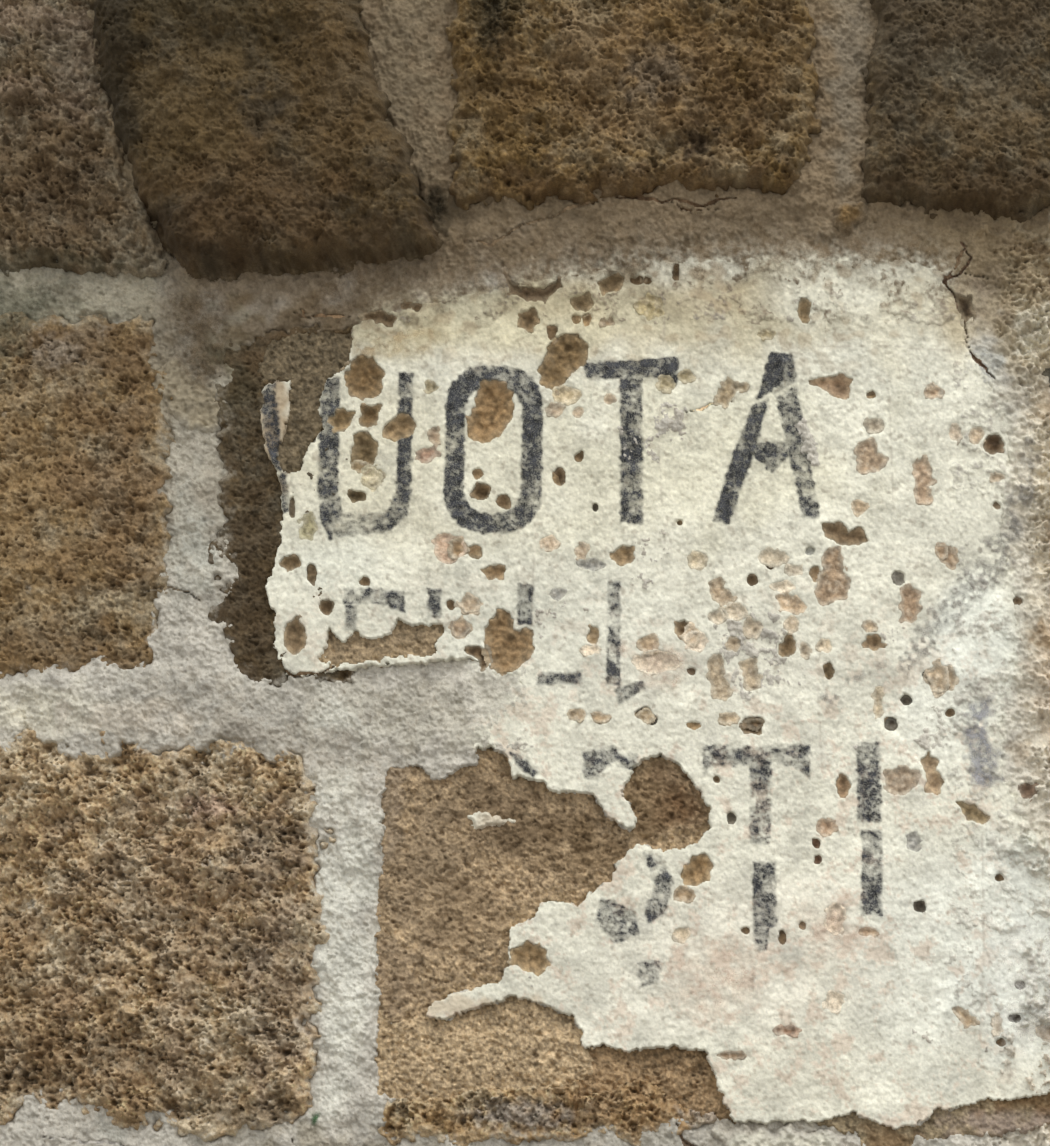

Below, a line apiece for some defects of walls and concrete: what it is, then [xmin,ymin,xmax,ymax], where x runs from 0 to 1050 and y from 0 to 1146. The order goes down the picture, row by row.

spalling [358,310,397,327]
crack [942,242,995,379]
spalling [257,330,441,503]
spalling [465,379,515,444]
spalling [469,479,511,510]
peeling [297,511,318,541]
spalling [279,554,301,572]
peeling [431,532,506,580]
spalling [284,614,307,655]
spalling [319,592,535,676]
spalling [374,747,747,1124]
crack [680,1135,695,1146]